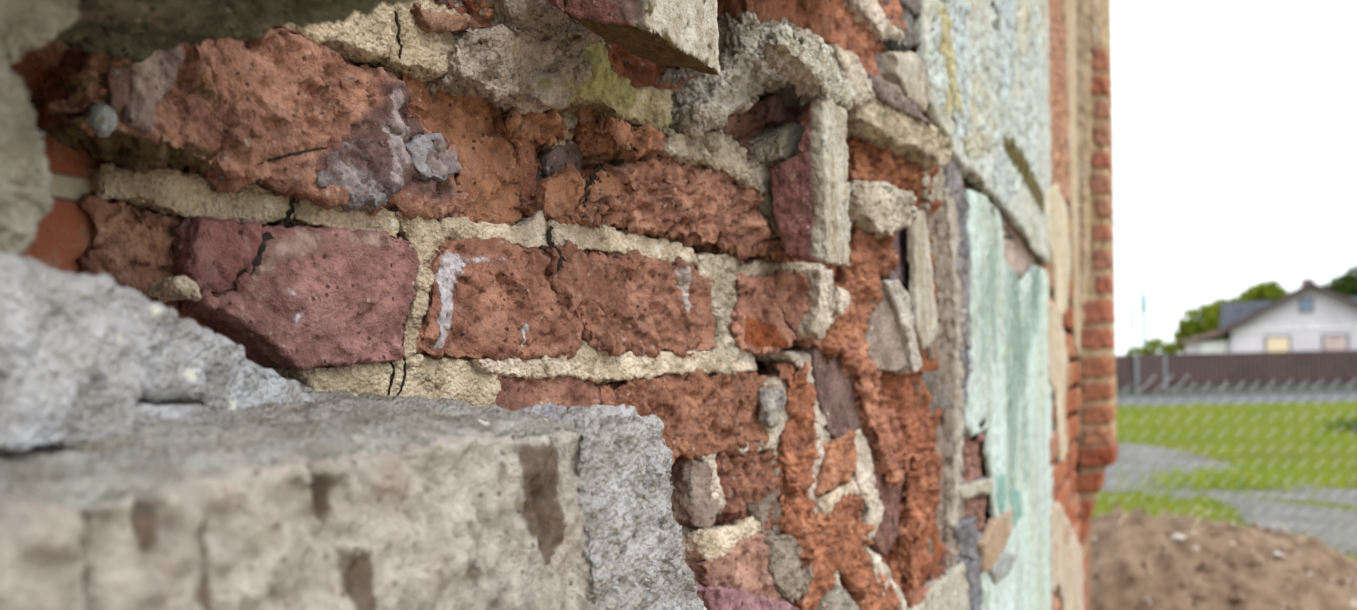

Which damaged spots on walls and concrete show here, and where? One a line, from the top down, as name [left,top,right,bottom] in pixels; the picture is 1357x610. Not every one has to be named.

crack [394,11,403,59]
crack [257,147,328,165]
crack [211,197,296,294]
crack [387,359,407,396]
peeling [980,234,1041,525]